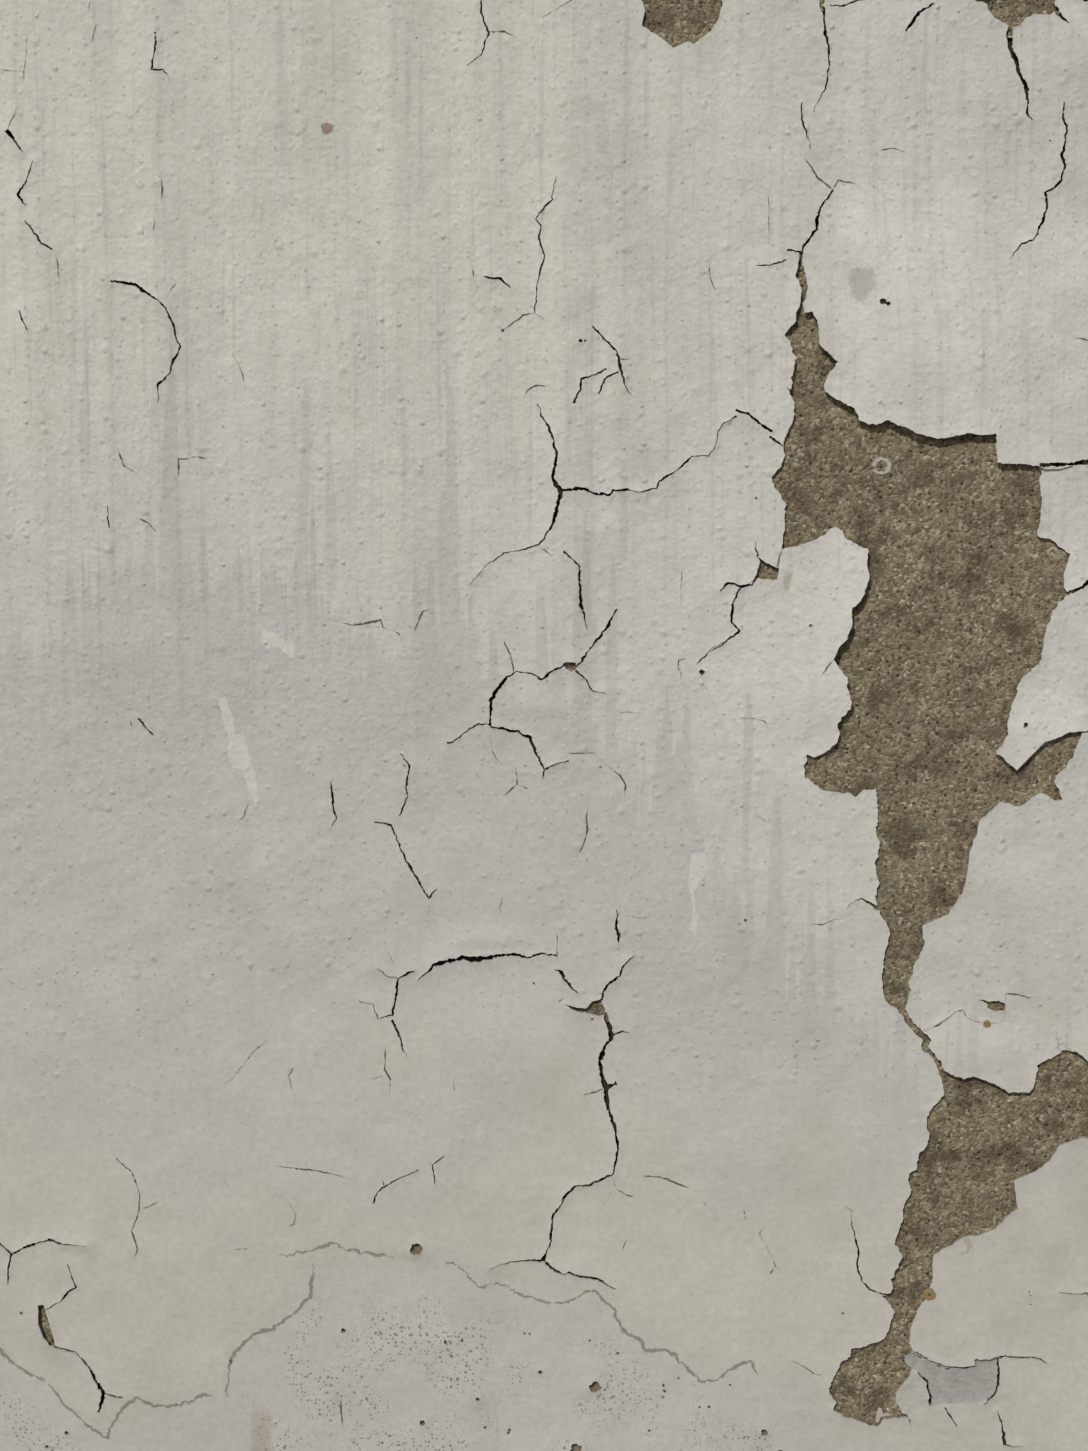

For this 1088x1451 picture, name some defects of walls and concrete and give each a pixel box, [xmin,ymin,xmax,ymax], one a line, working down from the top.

peeling [642,0,722,48]
crack [756,0,860,266]
peeling [976,0,1067,121]
crack [1010,104,1068,258]
crack [113,280,181,388]
crack [447,326,775,794]
peeling [698,180,1088,1426]
crack [360,910,684,1288]
crack [0,1238,71,1281]
crack [116,1158,155,1253]